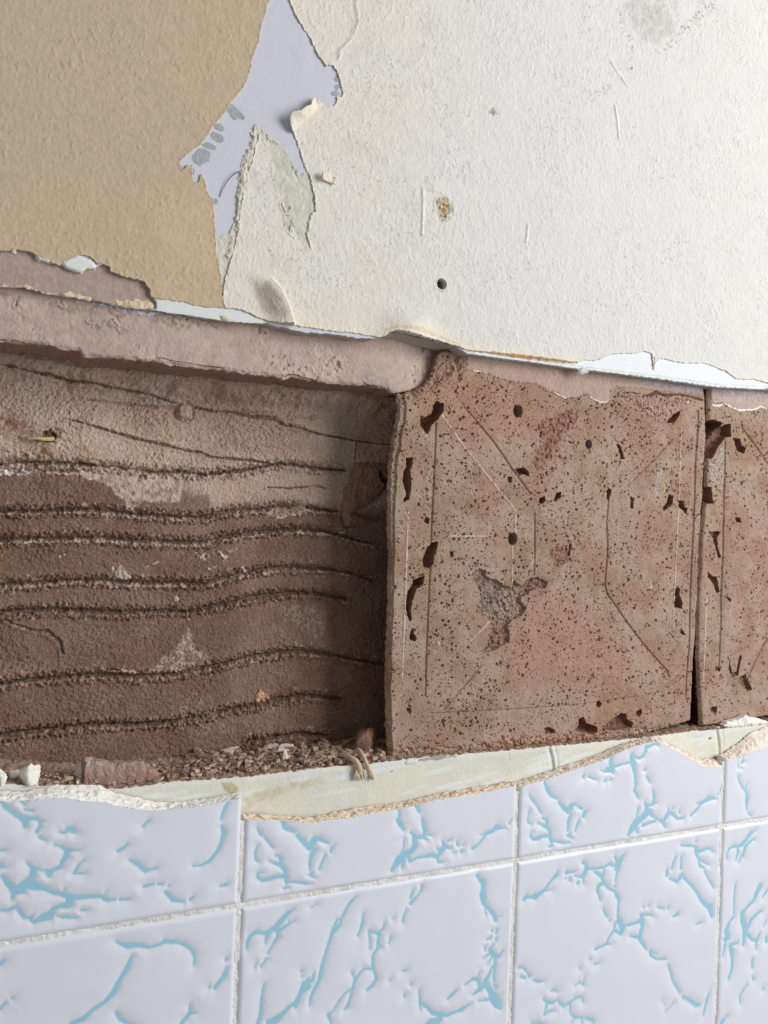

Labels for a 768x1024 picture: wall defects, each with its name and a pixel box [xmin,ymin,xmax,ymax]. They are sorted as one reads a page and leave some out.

peeling [180,0,342,261]
peeling [468,351,768,390]
spalling [473,569,547,653]
spalling [0,776,241,811]
spalling [241,713,768,823]